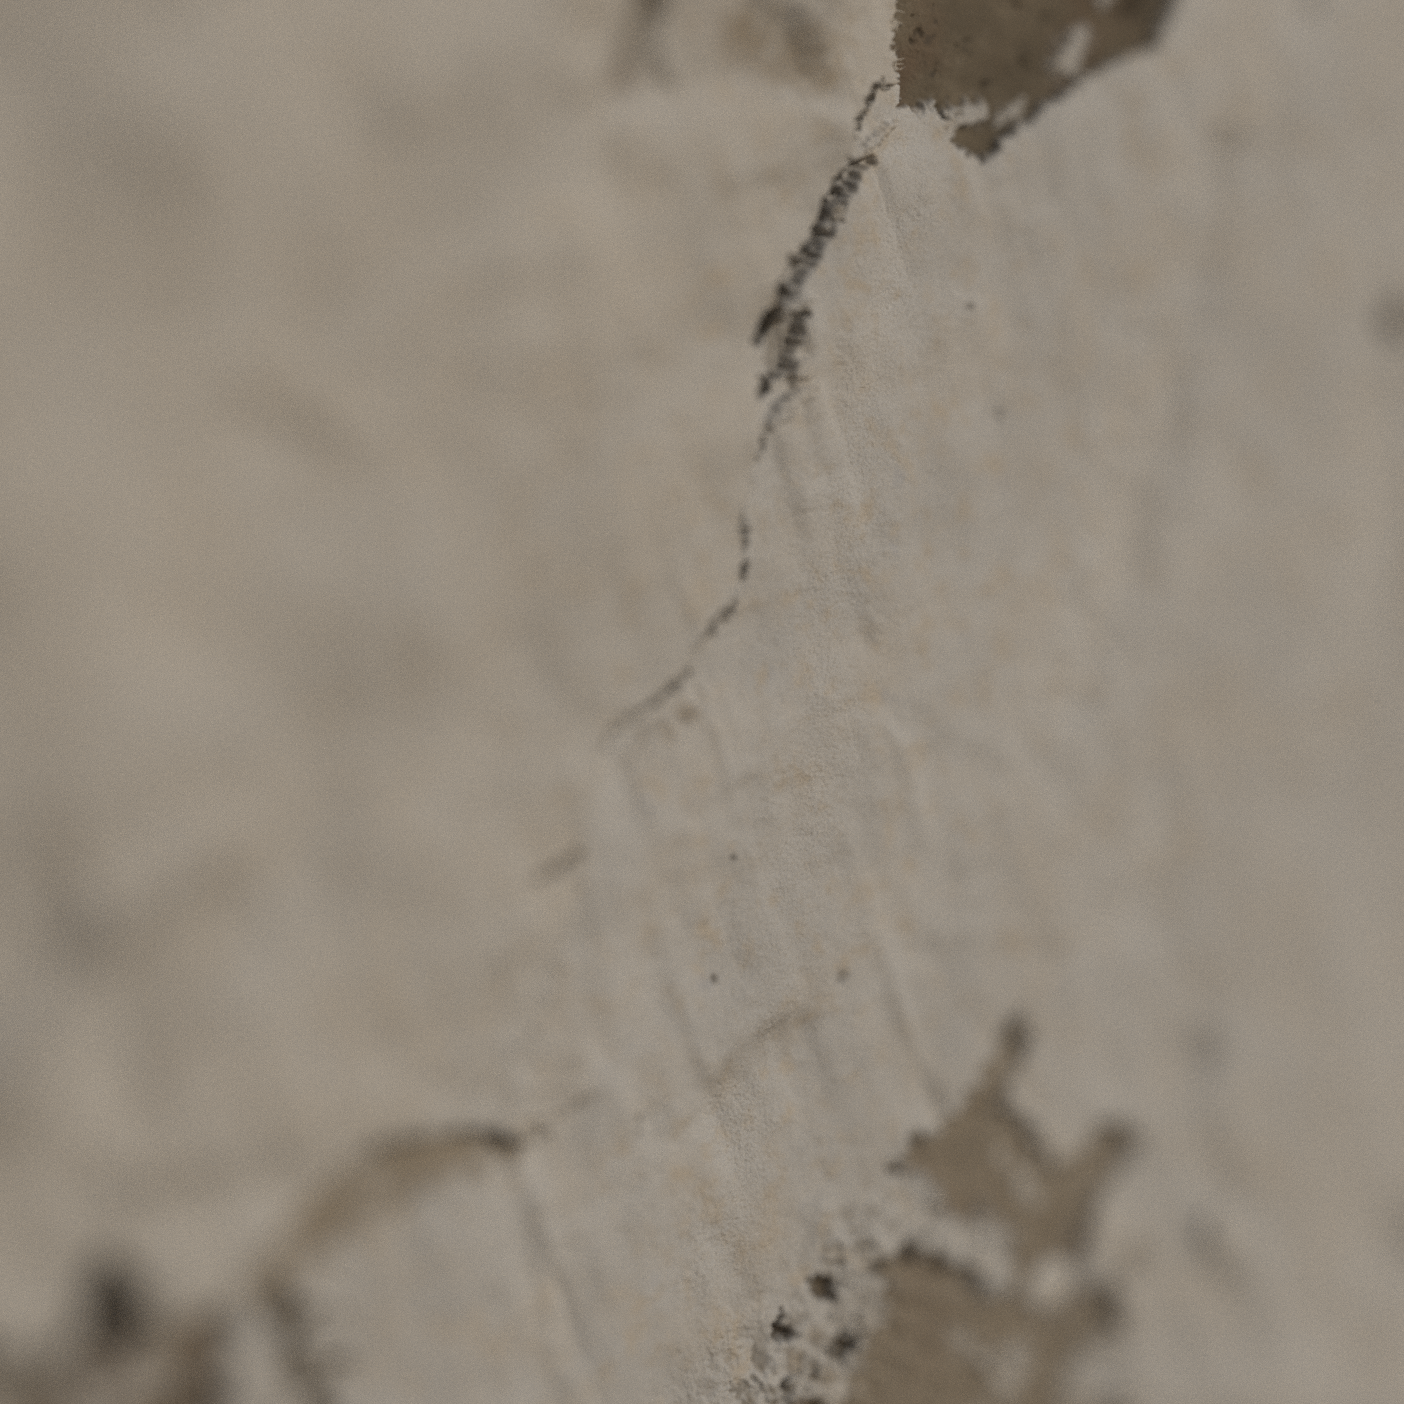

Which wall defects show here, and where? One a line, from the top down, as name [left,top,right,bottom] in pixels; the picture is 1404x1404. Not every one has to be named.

peeling [0,0,900,1404]
crack [608,80,899,731]
spalling [890,0,1174,164]
spalling [885,1010,1143,1308]